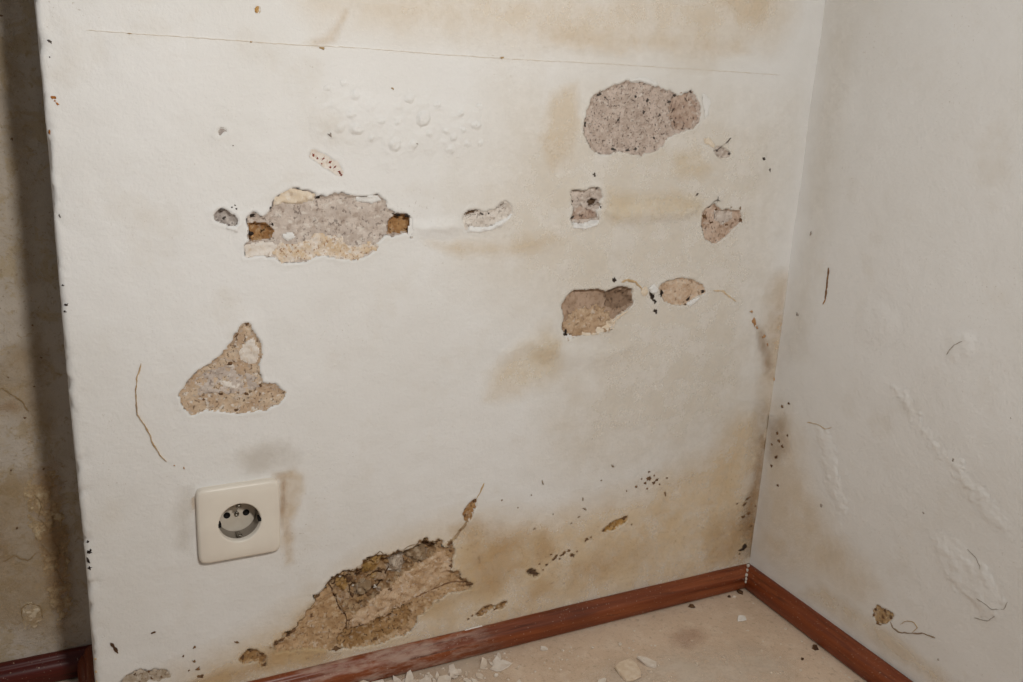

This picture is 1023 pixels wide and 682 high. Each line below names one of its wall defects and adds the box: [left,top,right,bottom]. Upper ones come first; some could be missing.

spalling [583,77,711,156]
spalling [214,188,413,263]
spalling [463,201,512,234]
spalling [570,172,602,231]
spalling [701,197,742,243]
spalling [561,277,736,341]
spalling [179,322,286,415]
leakage [418,429,756,630]
spalling [234,483,484,667]
spalling [121,668,171,682]